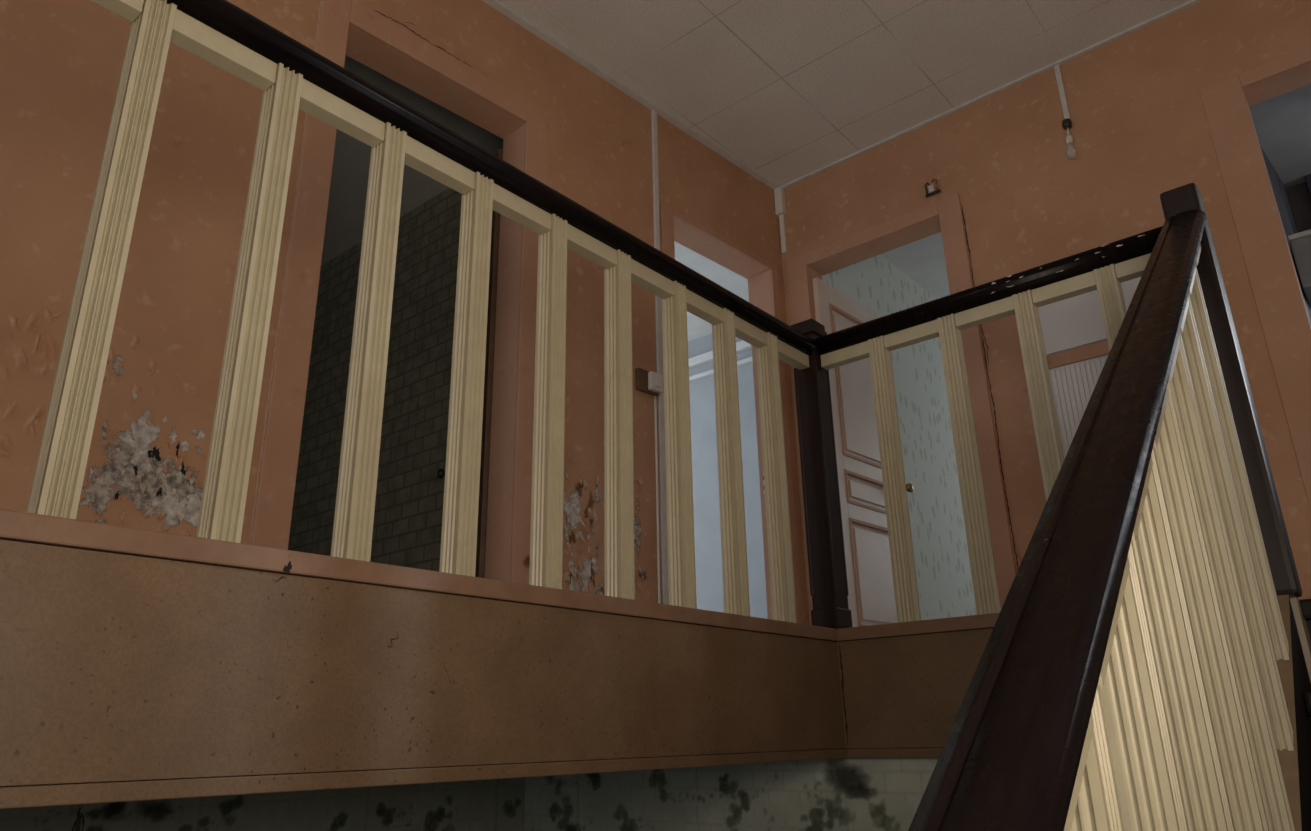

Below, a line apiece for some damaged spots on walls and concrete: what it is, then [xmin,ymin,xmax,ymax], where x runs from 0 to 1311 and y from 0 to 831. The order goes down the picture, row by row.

flaking render [79,391,205,536]
peeling [564,507,596,593]
damp [103,804,123,817]
damp [828,763,871,799]